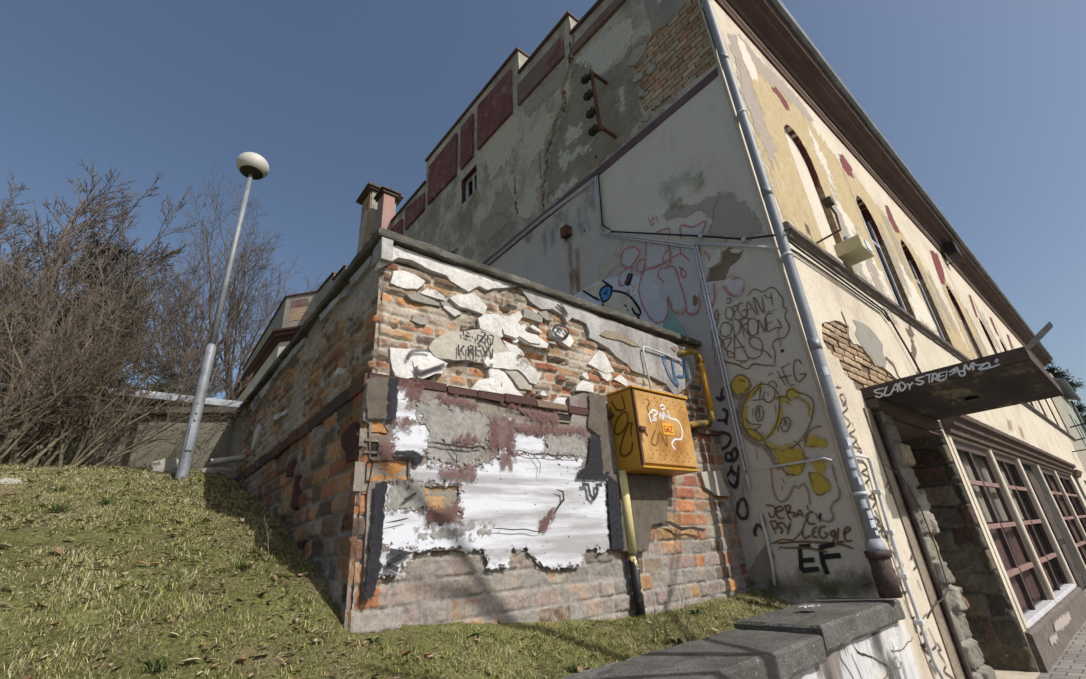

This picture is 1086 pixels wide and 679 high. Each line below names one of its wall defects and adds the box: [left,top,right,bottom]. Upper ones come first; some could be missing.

crack [512,37,575,222]
peeling [478,0,1015,360]
peeling [289,231,695,602]
flaking render [698,470,729,497]
spalling [822,319,894,390]
peeling [1052,395,1086,472]